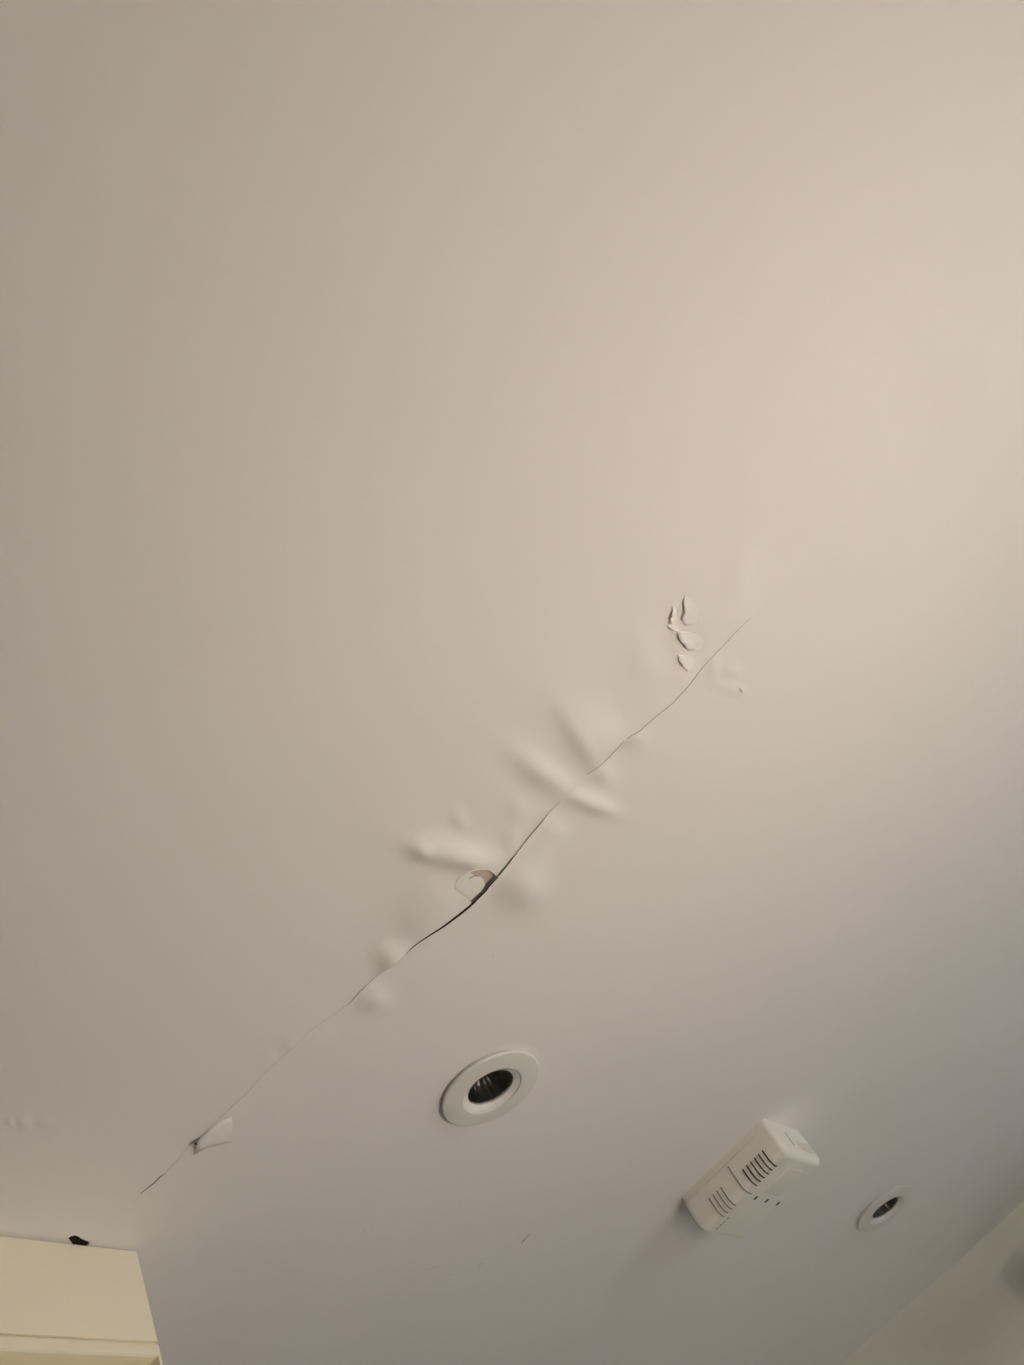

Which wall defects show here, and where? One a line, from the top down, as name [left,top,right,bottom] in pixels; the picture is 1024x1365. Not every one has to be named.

crack [589,618,750,774]
peeling [667,596,704,671]
crack [141,802,560,1193]